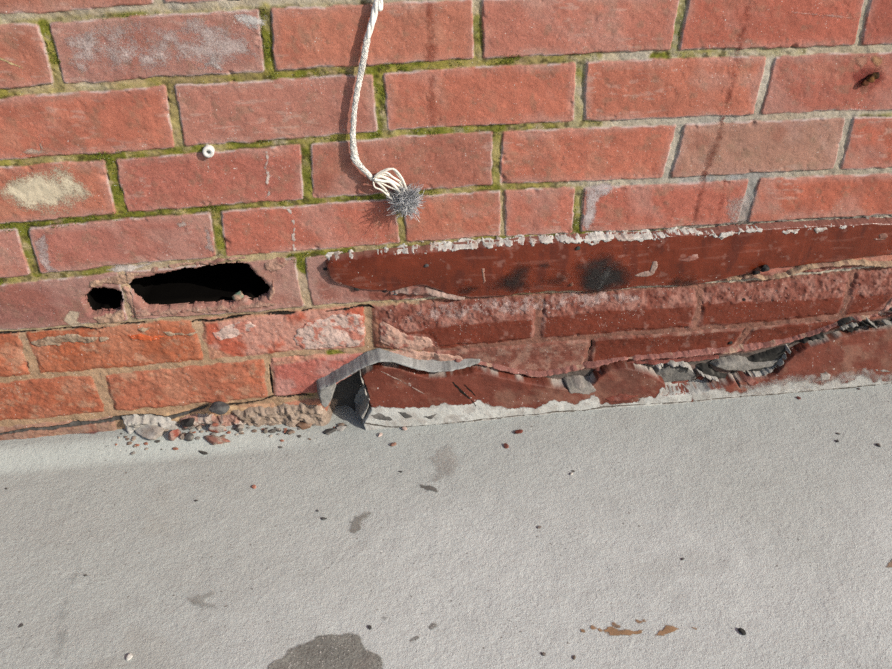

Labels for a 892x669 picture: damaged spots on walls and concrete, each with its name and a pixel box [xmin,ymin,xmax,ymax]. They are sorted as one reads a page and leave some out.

spalling [724,259,892,281]
spalling [87,256,289,341]
spalling [382,286,465,300]
spalling [31,334,109,347]
spalling [293,312,365,350]
spalling [378,322,463,361]
peeling [355,369,892,437]
leakage [268,633,383,669]